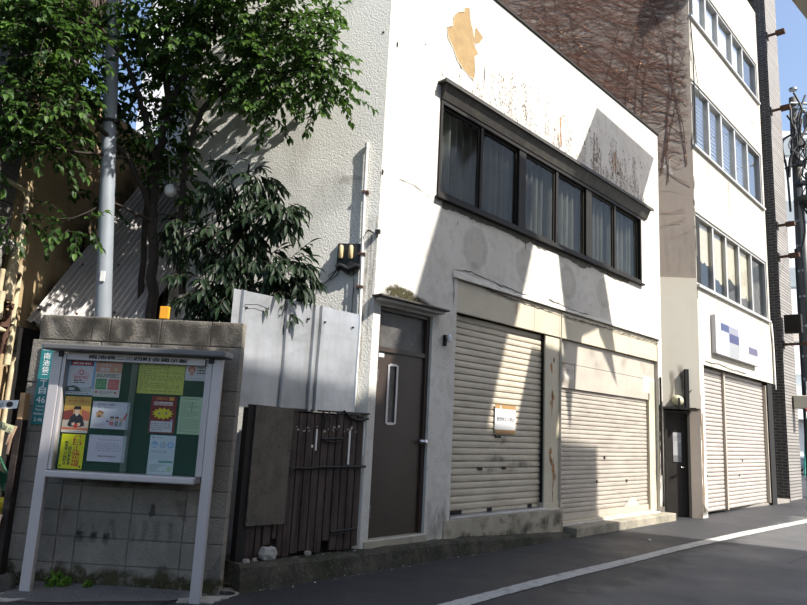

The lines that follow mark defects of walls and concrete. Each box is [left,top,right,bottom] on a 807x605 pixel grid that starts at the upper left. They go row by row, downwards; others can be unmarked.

peeling [447,7,646,200]